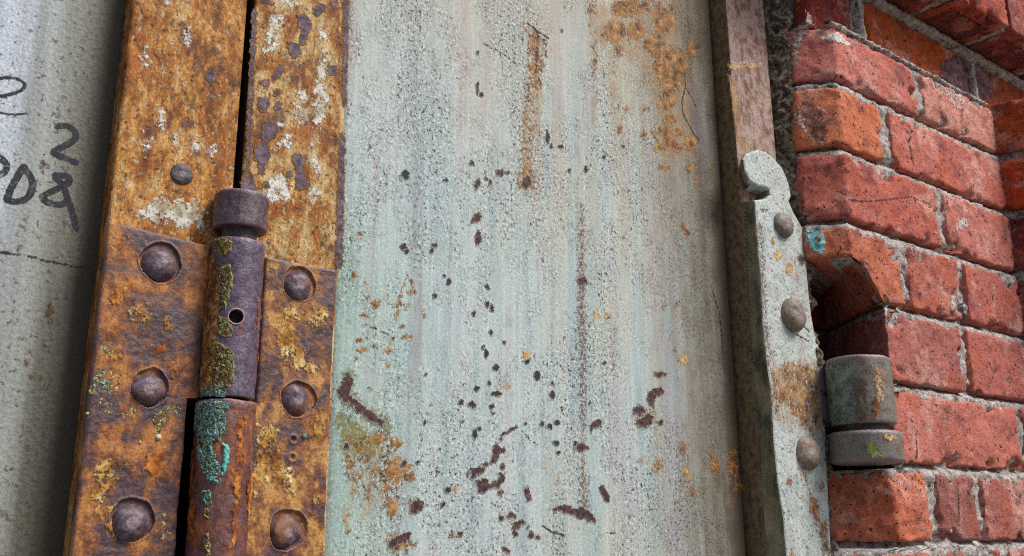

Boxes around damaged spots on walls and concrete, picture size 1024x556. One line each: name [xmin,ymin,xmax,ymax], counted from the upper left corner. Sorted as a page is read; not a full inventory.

corrosion [519,28,548,171]
corrosion [587,0,700,185]
corrosion [106,282,174,355]
corrosion [198,255,222,394]
corrosion [275,305,334,374]
corrosion [347,271,426,367]
corrosion [757,206,821,432]
corrosion [89,440,171,540]
corrosion [187,451,197,549]
corrosion [229,413,323,548]
corrosion [313,408,416,517]